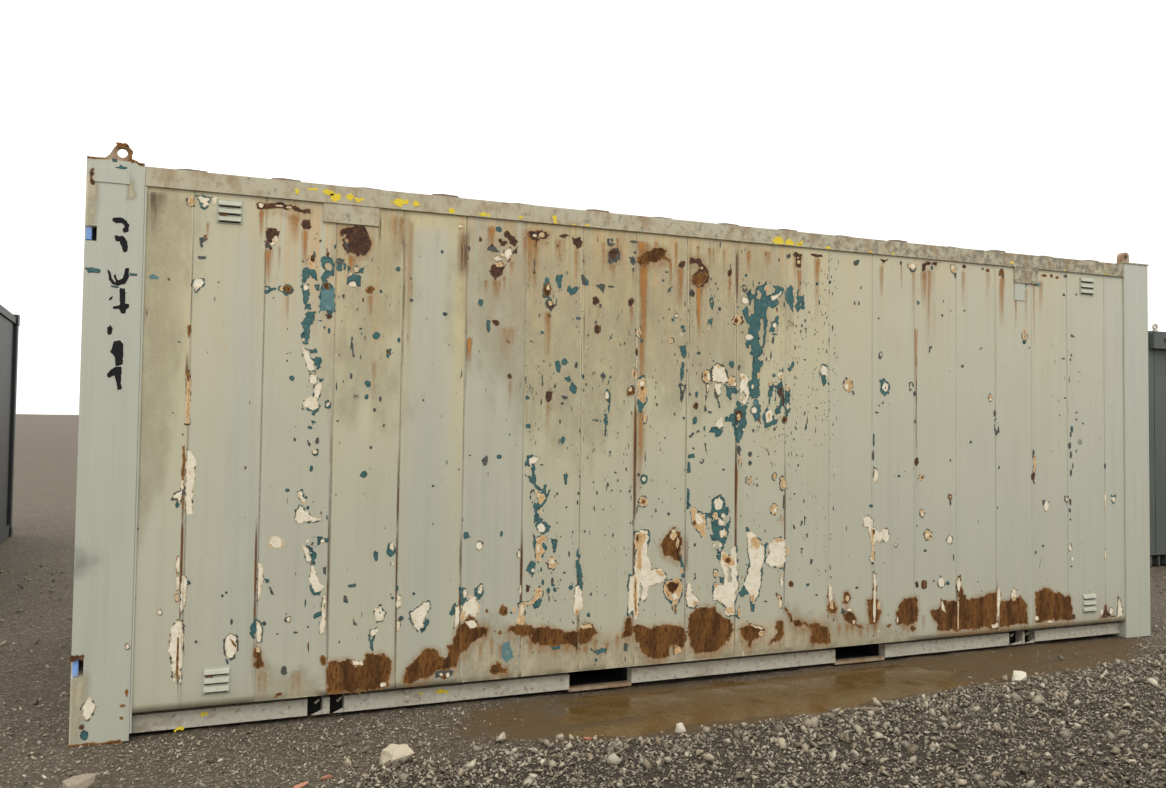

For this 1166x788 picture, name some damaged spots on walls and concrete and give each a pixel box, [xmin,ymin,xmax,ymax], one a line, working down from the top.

peeling [264,248,364,456]
rust [339,225,381,268]
rust [608,239,710,366]
peeling [669,282,805,485]
peeling [167,556,191,684]
peeling [171,449,197,516]
peeling [268,536,284,550]
rust [320,592,598,694]
peeling [510,454,558,625]
peeling [626,472,789,620]
rust [622,606,831,659]
rust [826,572,1075,632]